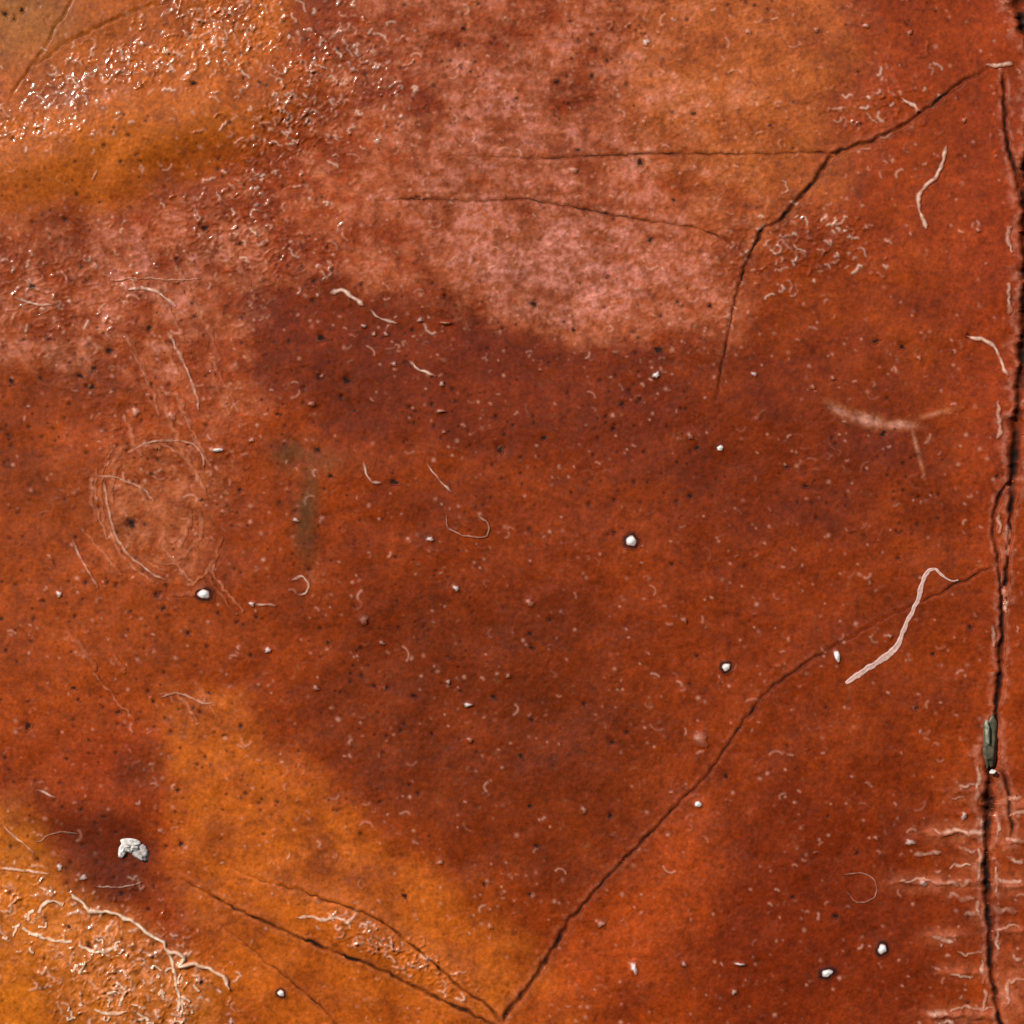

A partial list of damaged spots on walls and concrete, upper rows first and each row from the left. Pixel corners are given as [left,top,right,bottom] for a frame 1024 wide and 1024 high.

corrosion [0,0,329,90]
corrosion [661,0,897,287]
crack [1008,0,1024,49]
crack [183,67,1024,1024]
corrosion [0,783,64,1024]
corrosion [136,669,752,1024]